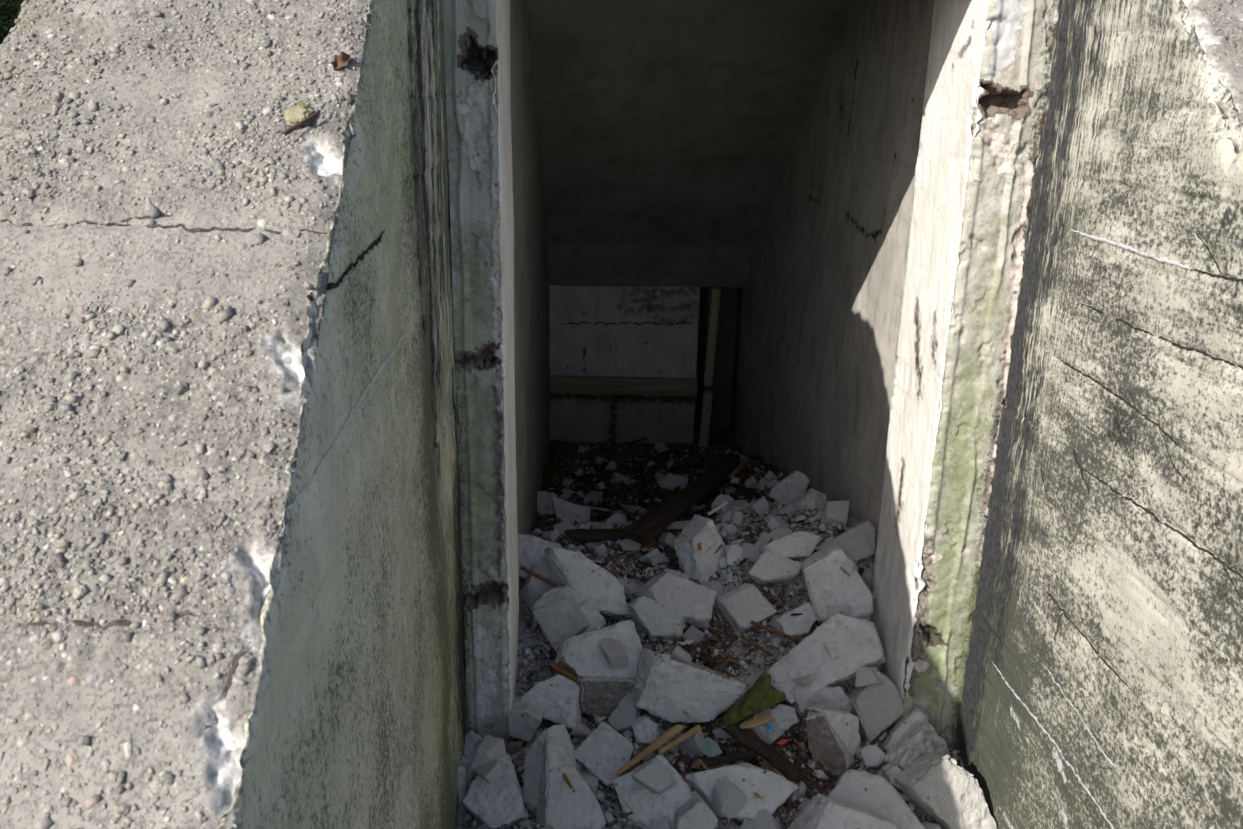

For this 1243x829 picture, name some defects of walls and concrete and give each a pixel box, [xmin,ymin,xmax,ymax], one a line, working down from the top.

crack [1,214,328,234]
spalling [455,27,509,612]
flaking render [974,79,1042,567]
crack [1081,303,1243,370]
crack [1192,232,1243,282]
damp [1208,190,1243,312]
damp [950,0,1191,829]
crack [1057,357,1188,485]
spalling [237,542,280,644]
crack [1073,449,1243,600]
damp [1193,493,1241,581]
spalling [199,701,250,829]